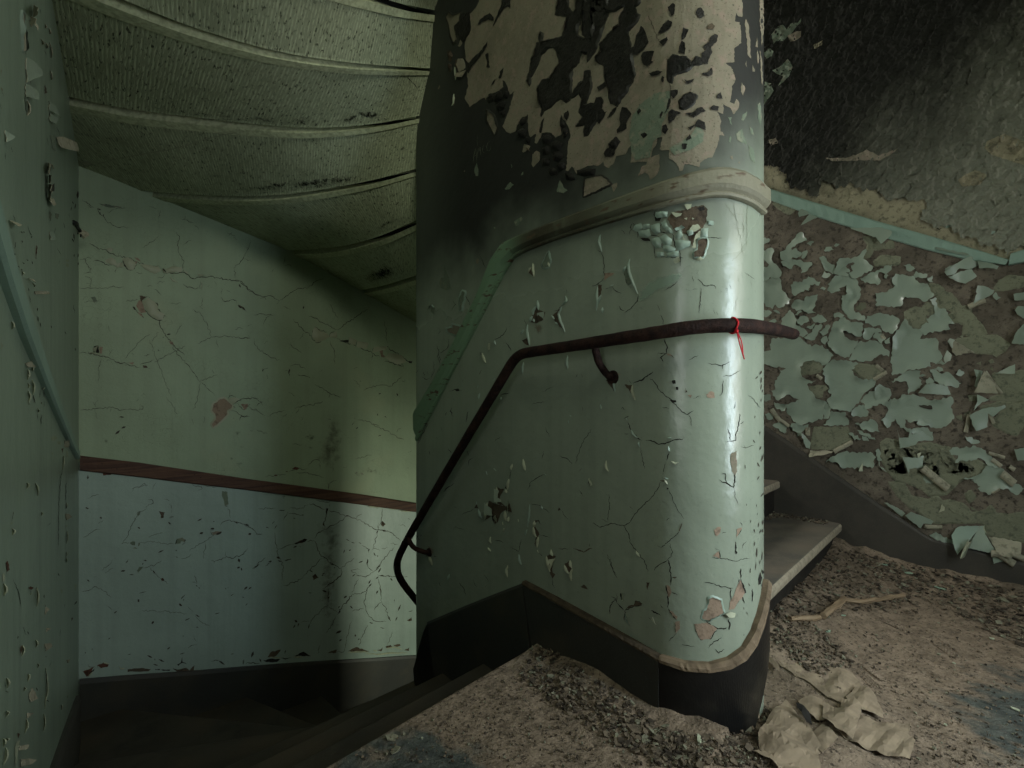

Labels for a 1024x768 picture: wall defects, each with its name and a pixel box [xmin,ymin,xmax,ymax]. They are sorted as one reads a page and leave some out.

peeling [10,5,79,152]
peeling [444,0,801,198]
peeling [673,237,709,264]
crack [83,483,412,649]
crack [82,201,511,474]
peeling [463,459,526,551]
crack [525,272,758,583]
peeling [694,493,764,640]
peeling [754,202,1024,559]
peeling [2,664,68,766]